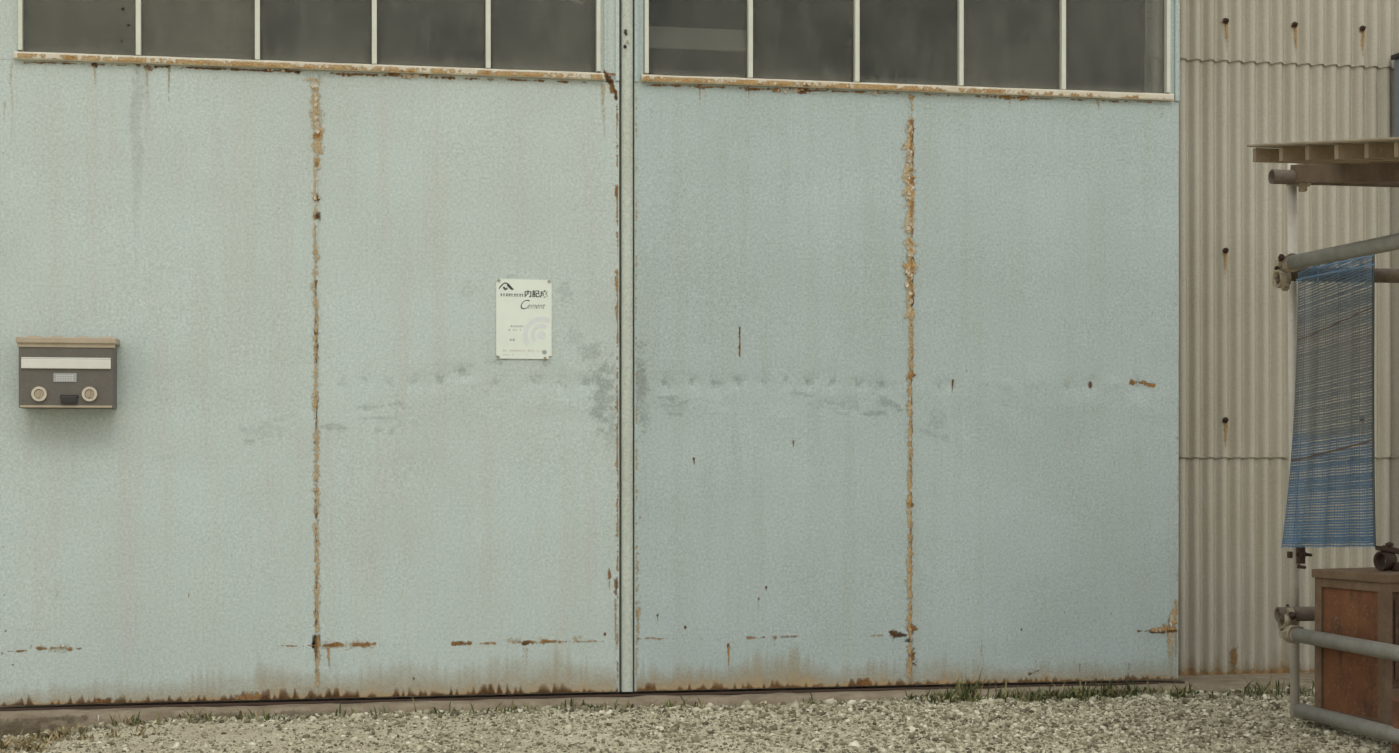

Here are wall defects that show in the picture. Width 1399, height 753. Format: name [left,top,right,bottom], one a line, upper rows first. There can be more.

corrosion [18,53,618,121]
corrosion [642,76,1152,106]
corrosion [451,185,619,646]
corrosion [0,546,1315,706]